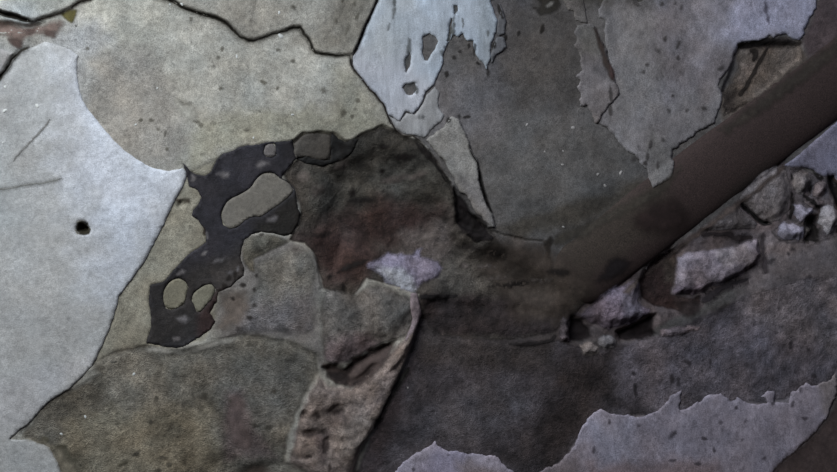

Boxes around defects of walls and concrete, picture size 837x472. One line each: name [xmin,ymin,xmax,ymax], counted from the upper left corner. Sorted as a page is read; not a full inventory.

crack [0,47,29,79]
crack [0,0,91,22]
crack [168,0,421,142]
peeling [353,0,506,138]
peeling [564,0,817,188]
crack [470,150,492,212]
peeling [0,42,359,472]
damp [148,335,242,354]
spalling [286,117,837,472]